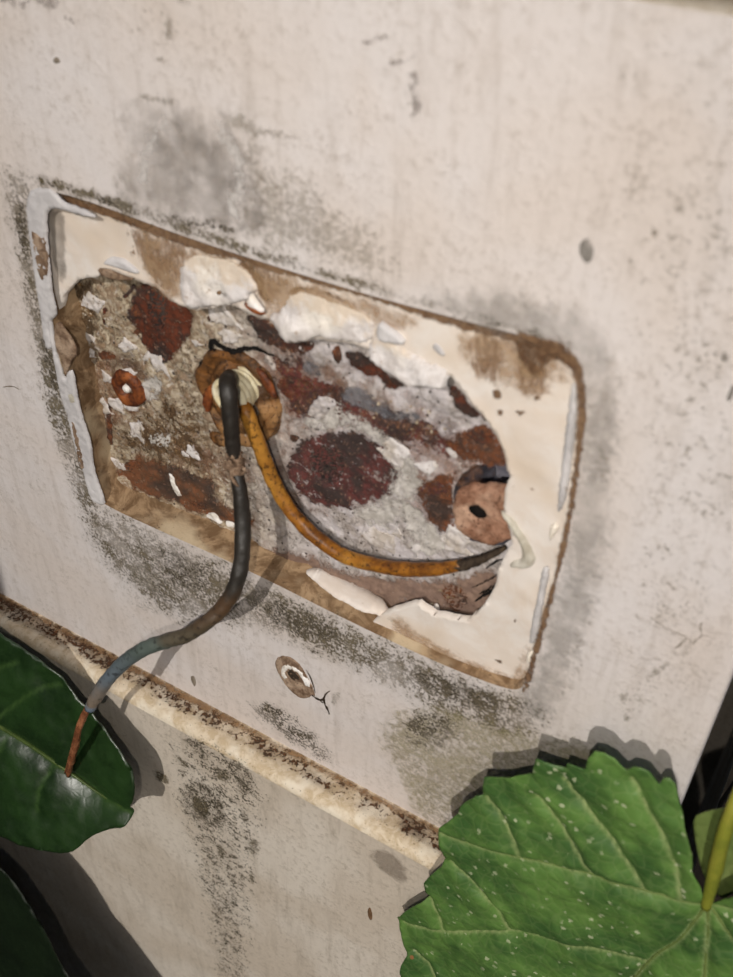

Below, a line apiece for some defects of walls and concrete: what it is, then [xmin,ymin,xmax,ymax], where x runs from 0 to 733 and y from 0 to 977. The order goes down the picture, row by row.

peeling [98,256,140,281]
corrosion [123,284,193,363]
peeling [244,293,266,316]
leakage [38,121,569,415]
leakage [11,200,232,624]
peeling [149,433,170,447]
corrosion [247,315,506,510]
corrosion [417,471,462,532]
hole [275,656,315,698]
leakage [223,581,550,741]
corrosion [123,666,440,850]
leakage [155,729,269,977]